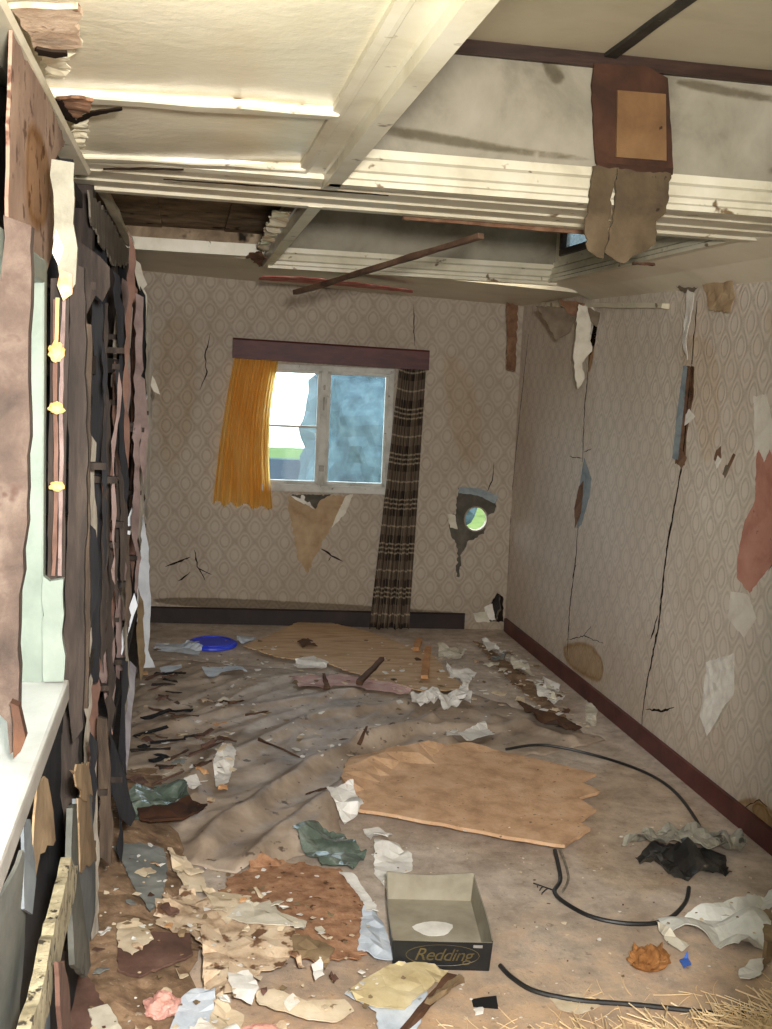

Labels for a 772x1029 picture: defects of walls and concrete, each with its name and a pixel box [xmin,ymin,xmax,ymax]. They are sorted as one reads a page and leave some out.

peeling [52,231,64,265]
spalling [47,278,70,581]
crack [572,356,591,462]
peeling [677,447,687,469]
peeling [753,394,772,461]
peeling [448,514,458,529]
crack [642,307,697,717]
crack [567,534,599,650]
peeling [700,653,735,736]